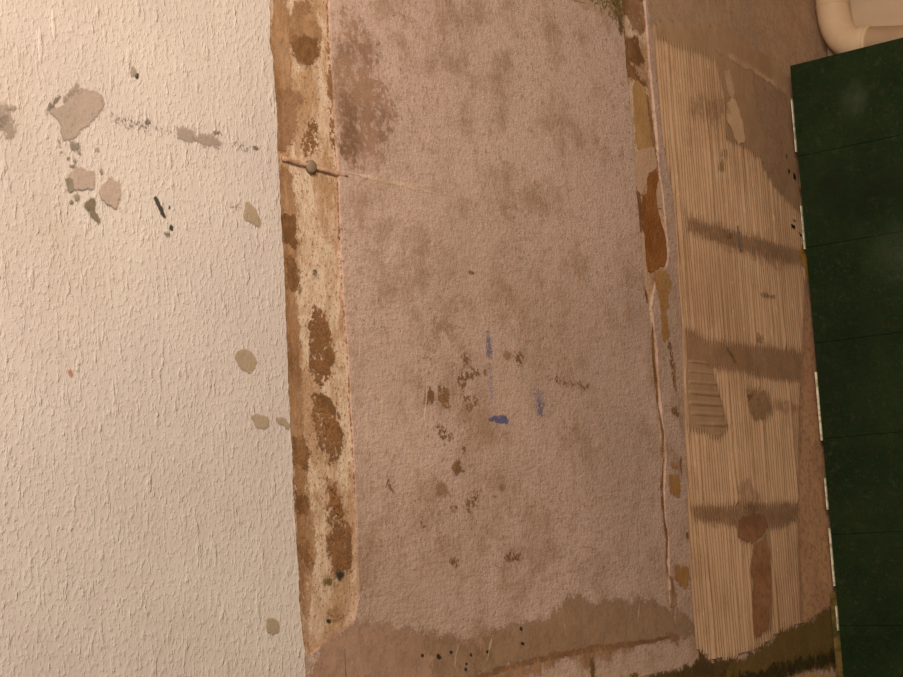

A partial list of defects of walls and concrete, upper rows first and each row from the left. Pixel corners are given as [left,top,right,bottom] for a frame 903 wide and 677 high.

flaking render [47,83,121,223]
spalling [636,169,667,291]
water stain [649,605,836,677]